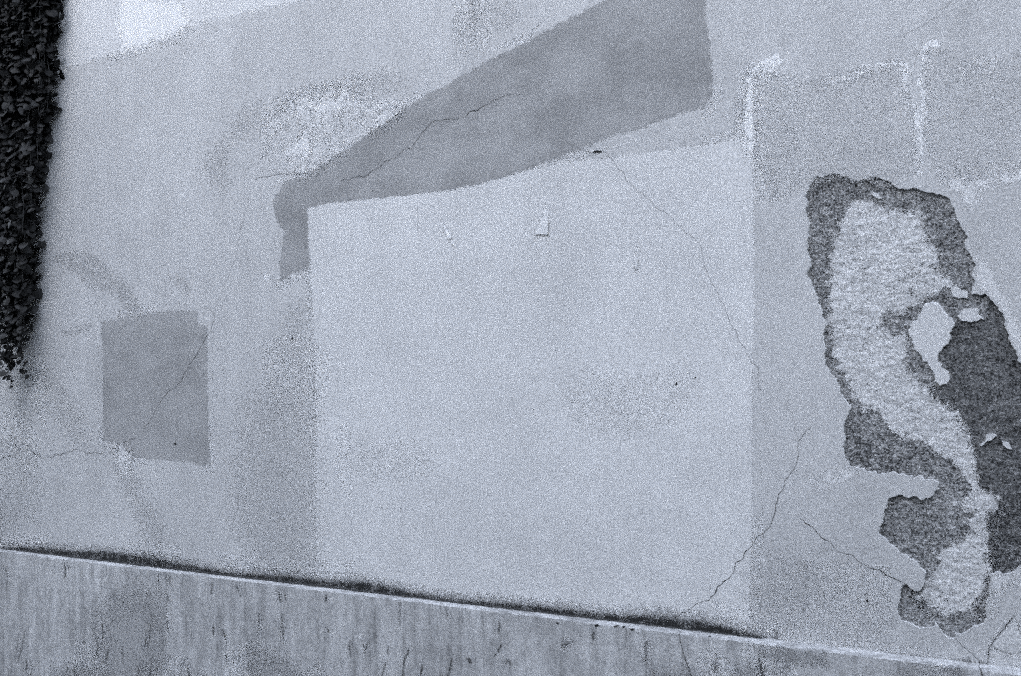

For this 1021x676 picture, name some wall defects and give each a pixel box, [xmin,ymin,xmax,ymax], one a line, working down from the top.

crack [343,94,518,180]
crack [561,136,760,389]
spalling [805,39,1021,639]
crack [670,403,811,675]
crack [801,519,904,583]